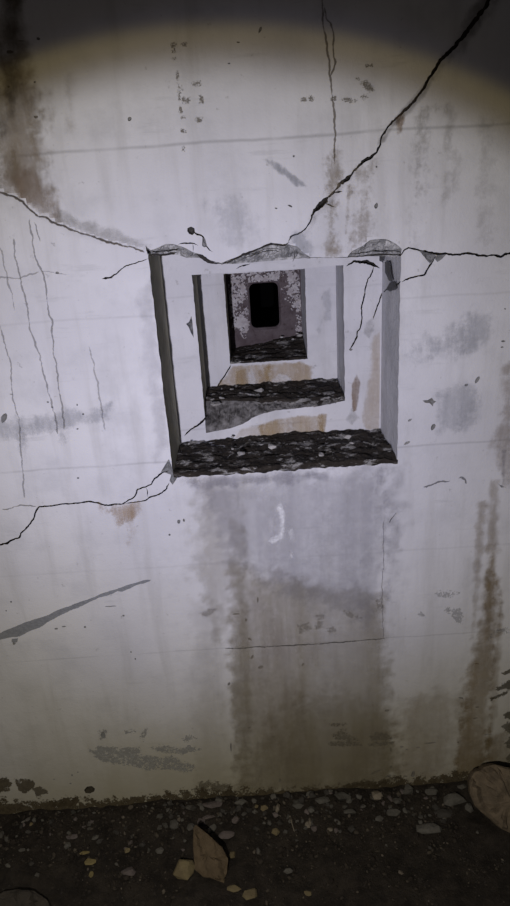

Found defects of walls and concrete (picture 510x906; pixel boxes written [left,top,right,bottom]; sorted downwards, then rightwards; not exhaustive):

crack [0,0,490,279]
peeling [146,237,310,339]
spalling [347,239,402,291]
crack [347,247,510,348]
spalling [205,396,345,433]
crack [0,471,169,546]
efflorescence [269,504,285,543]